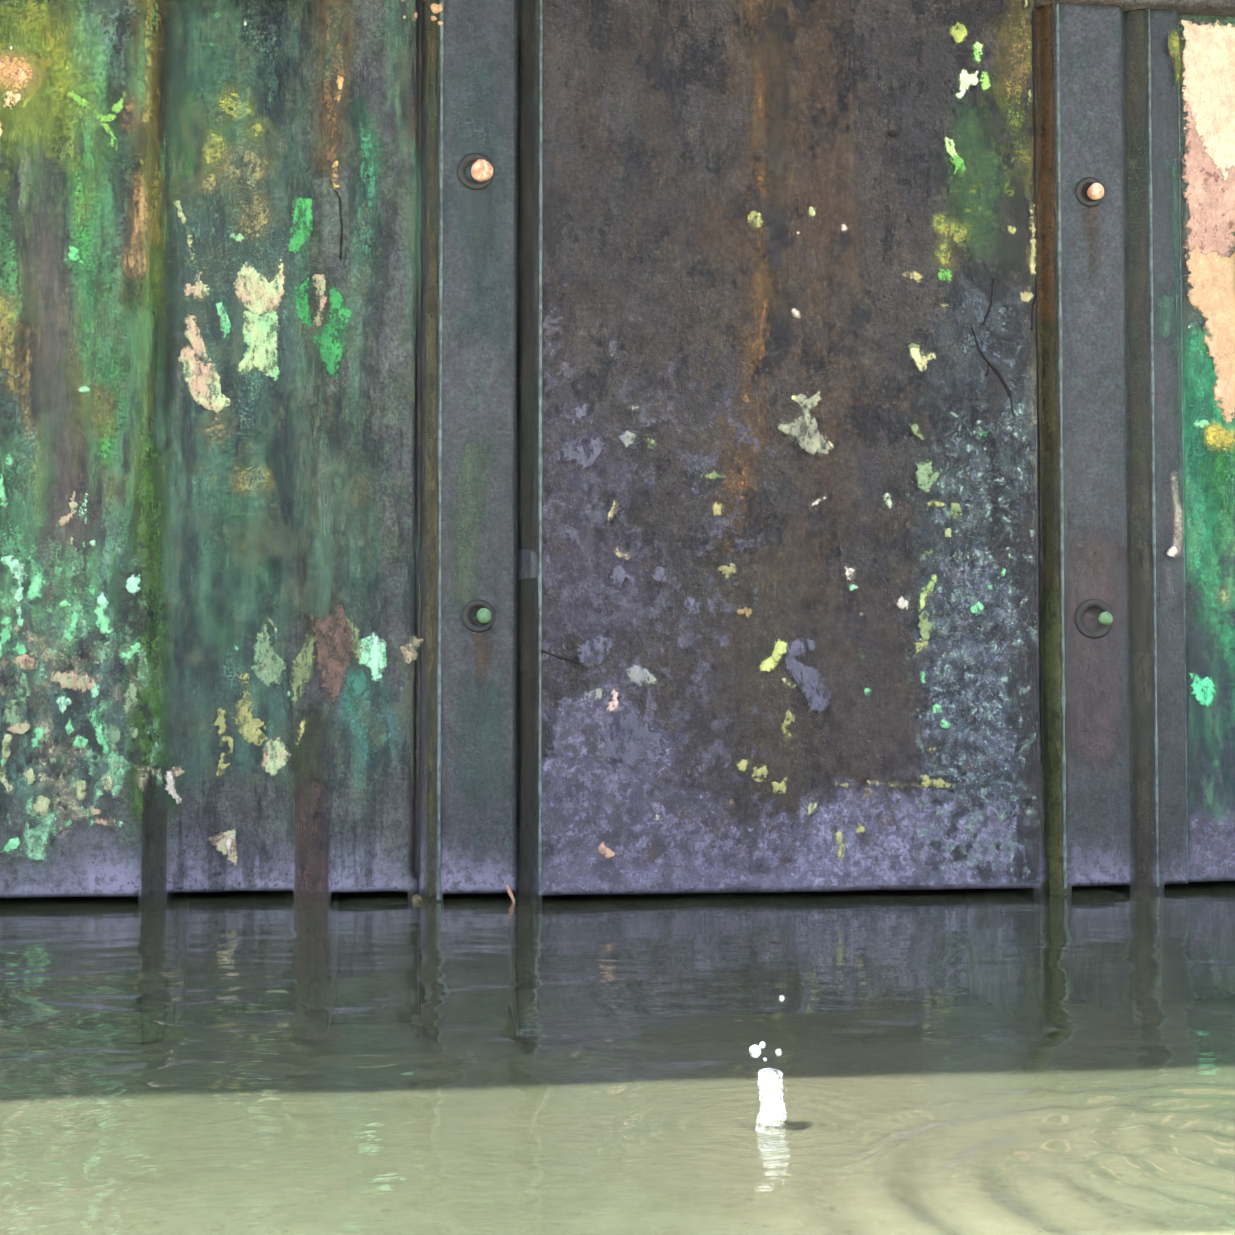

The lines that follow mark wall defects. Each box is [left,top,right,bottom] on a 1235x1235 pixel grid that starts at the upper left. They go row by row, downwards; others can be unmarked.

leakage [0,0,305,912]
peeling [178,315,230,412]
peeling [184,197,352,381]
rust [317,0,351,175]
leakage [353,98,380,271]
leakage [399,0,423,877]
rust [517,0,1065,903]
crack [971,10,1044,763]
rust [1125,9,1153,895]
peeling [1176,20,1235,422]
rust [294,709,329,909]
peeling [251,604,424,713]